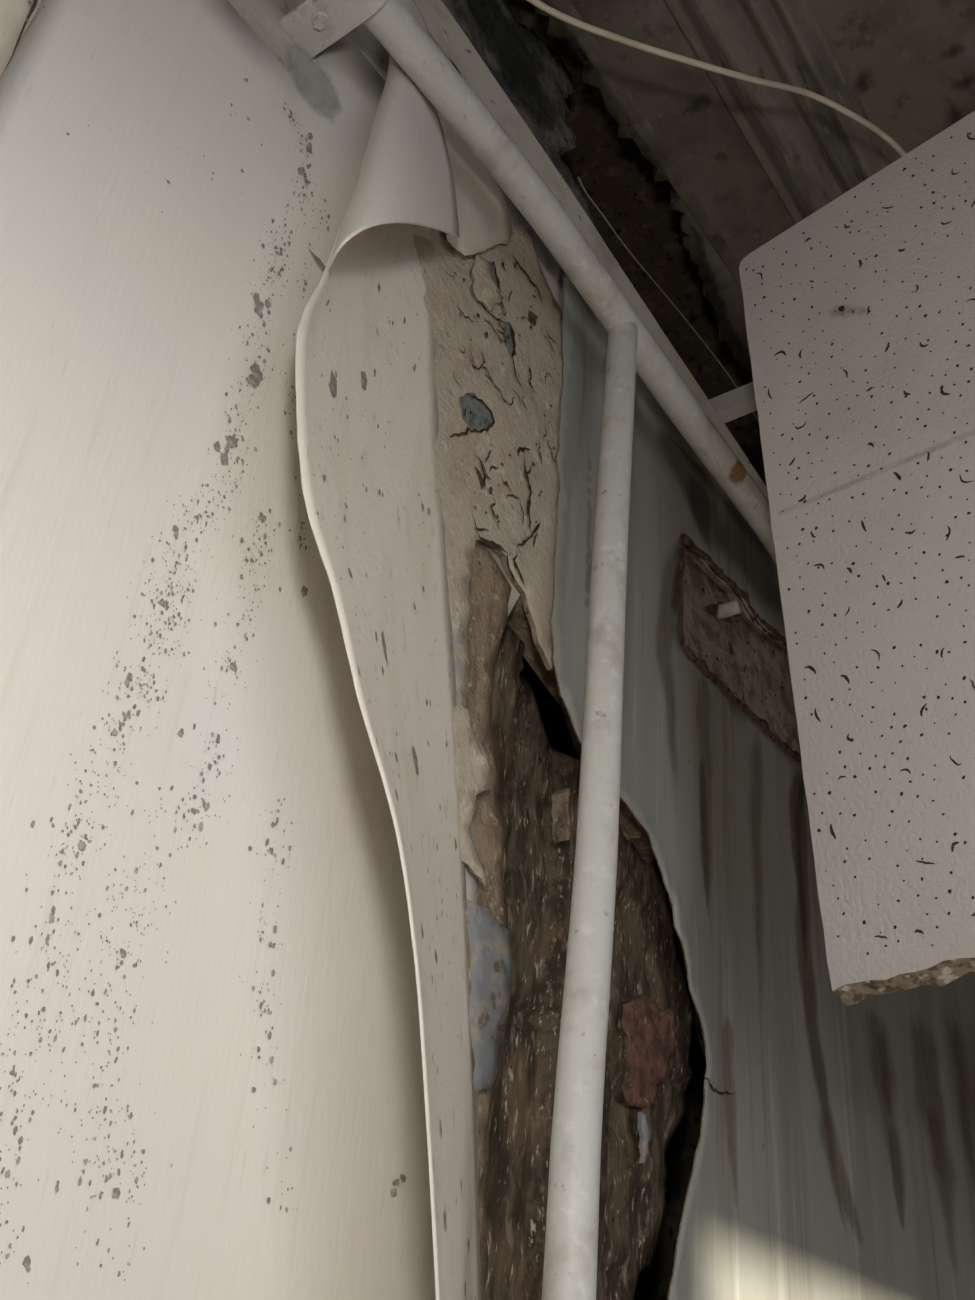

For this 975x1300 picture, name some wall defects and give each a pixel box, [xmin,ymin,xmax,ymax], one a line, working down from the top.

crack [1,0,38,76]
water stain [361,342,404,391]
crack [447,255,557,586]
water stain [0,103,365,1284]
water stain [358,631,388,680]
water stain [390,731,429,806]
peeling [413,225,578,1300]
spalling [678,533,802,764]
water stain [391,1174,406,1197]
spalling [634,1025,706,1300]